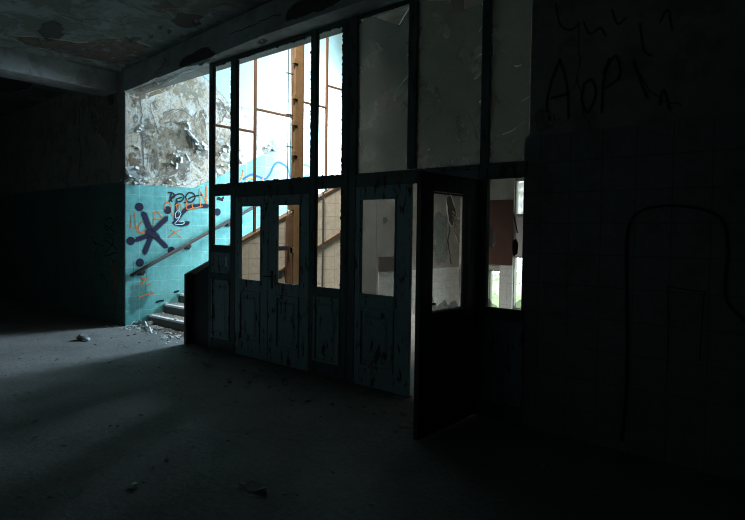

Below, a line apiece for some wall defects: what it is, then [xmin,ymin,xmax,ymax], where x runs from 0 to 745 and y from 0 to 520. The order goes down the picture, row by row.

flaking render [120,45,230,187]